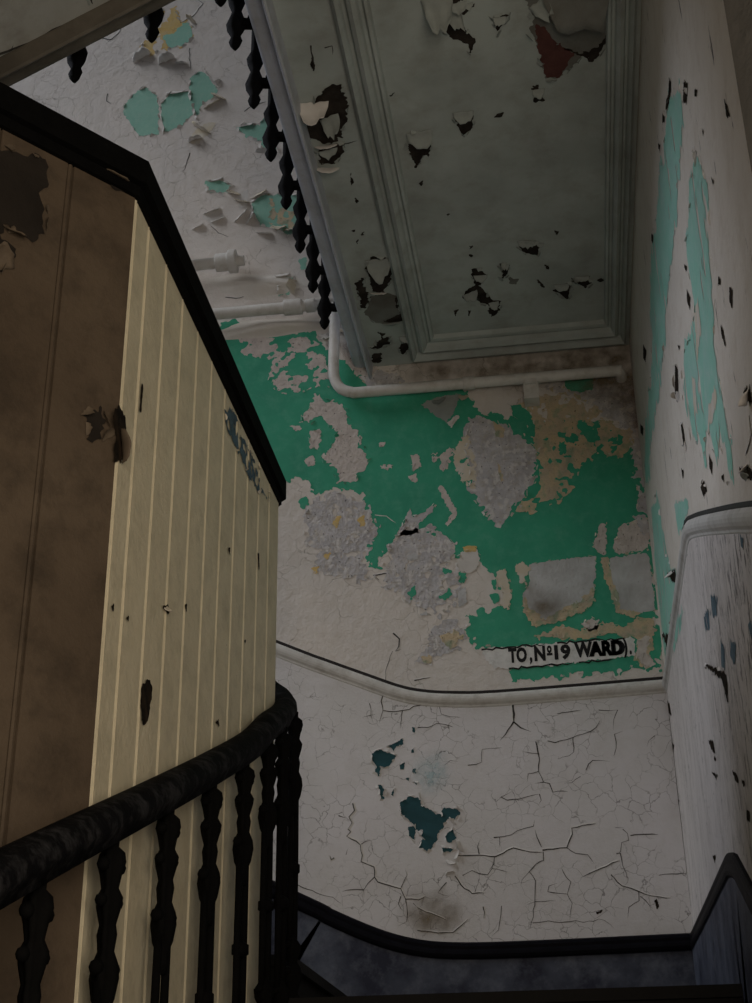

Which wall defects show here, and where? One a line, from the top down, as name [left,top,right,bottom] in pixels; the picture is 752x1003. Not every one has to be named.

peeling [132,6,197,64]
peeling [420,0,476,55]
peeling [525,0,609,103]
peeling [122,71,226,144]
peeling [192,177,297,238]
peeling [220,79,752,682]
peeling [704,639,736,702]
peeling [369,727,464,876]
crack [298,705,692,936]